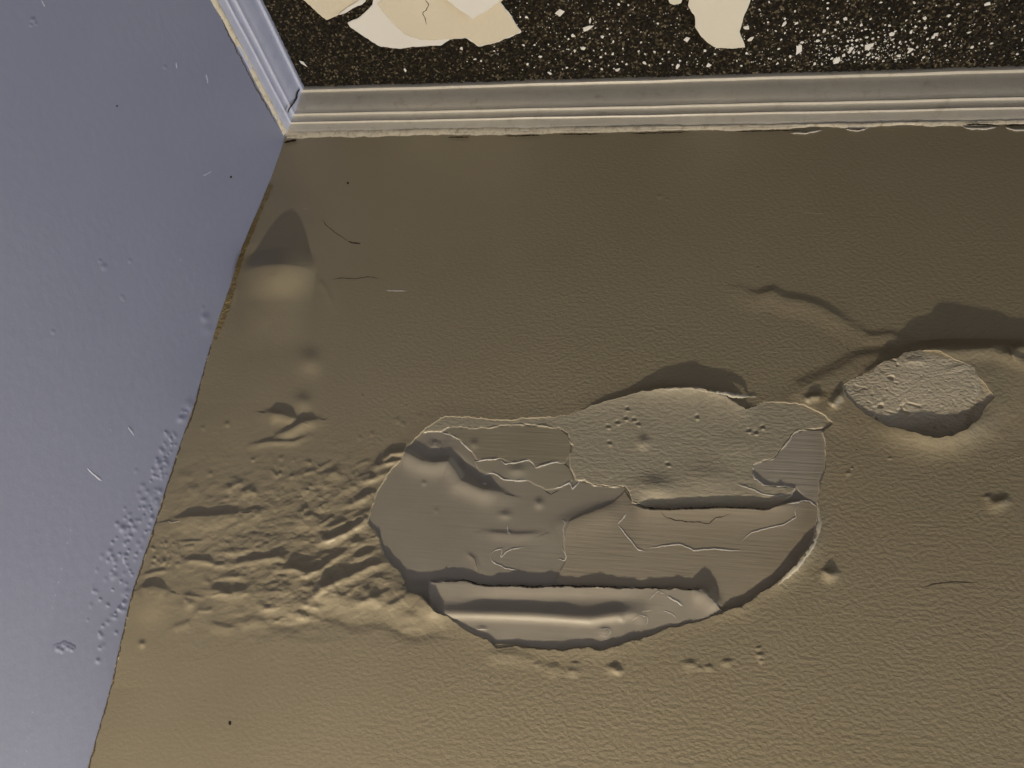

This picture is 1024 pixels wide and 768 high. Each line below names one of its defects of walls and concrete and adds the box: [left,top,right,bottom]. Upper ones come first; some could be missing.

peeling [304,0,366,20]
peeling [669,0,754,49]
spalling [841,349,995,438]
peeling [368,357,856,681]